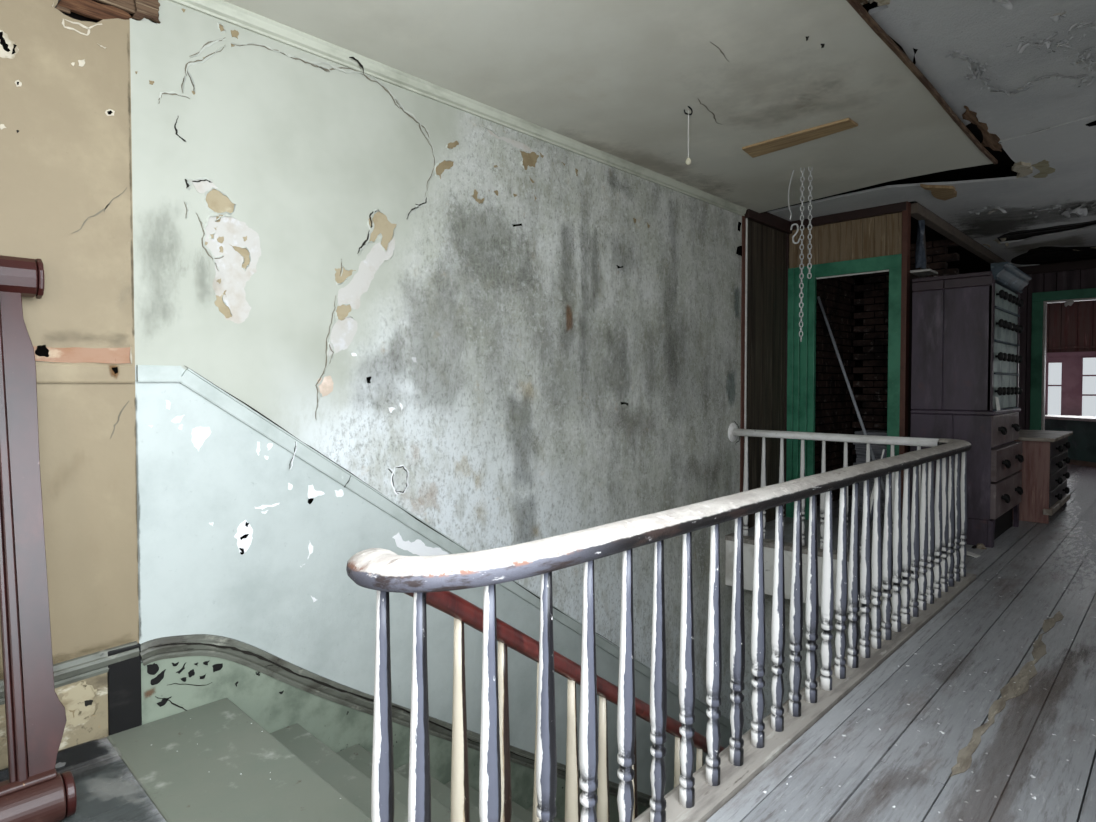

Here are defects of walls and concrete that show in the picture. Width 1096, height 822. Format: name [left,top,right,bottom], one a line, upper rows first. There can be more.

flaking render [0,30,19,59]
flaking render [52,0,161,48]
crack [158,38,436,219]
crack [71,188,127,234]
crack [184,177,224,271]
flaking render [190,180,261,324]
flaking render [327,208,397,357]
crack [315,210,379,420]
peeling [234,520,253,555]
peeling [392,533,449,556]
peeling [147,660,223,685]
peeling [60,681,100,726]